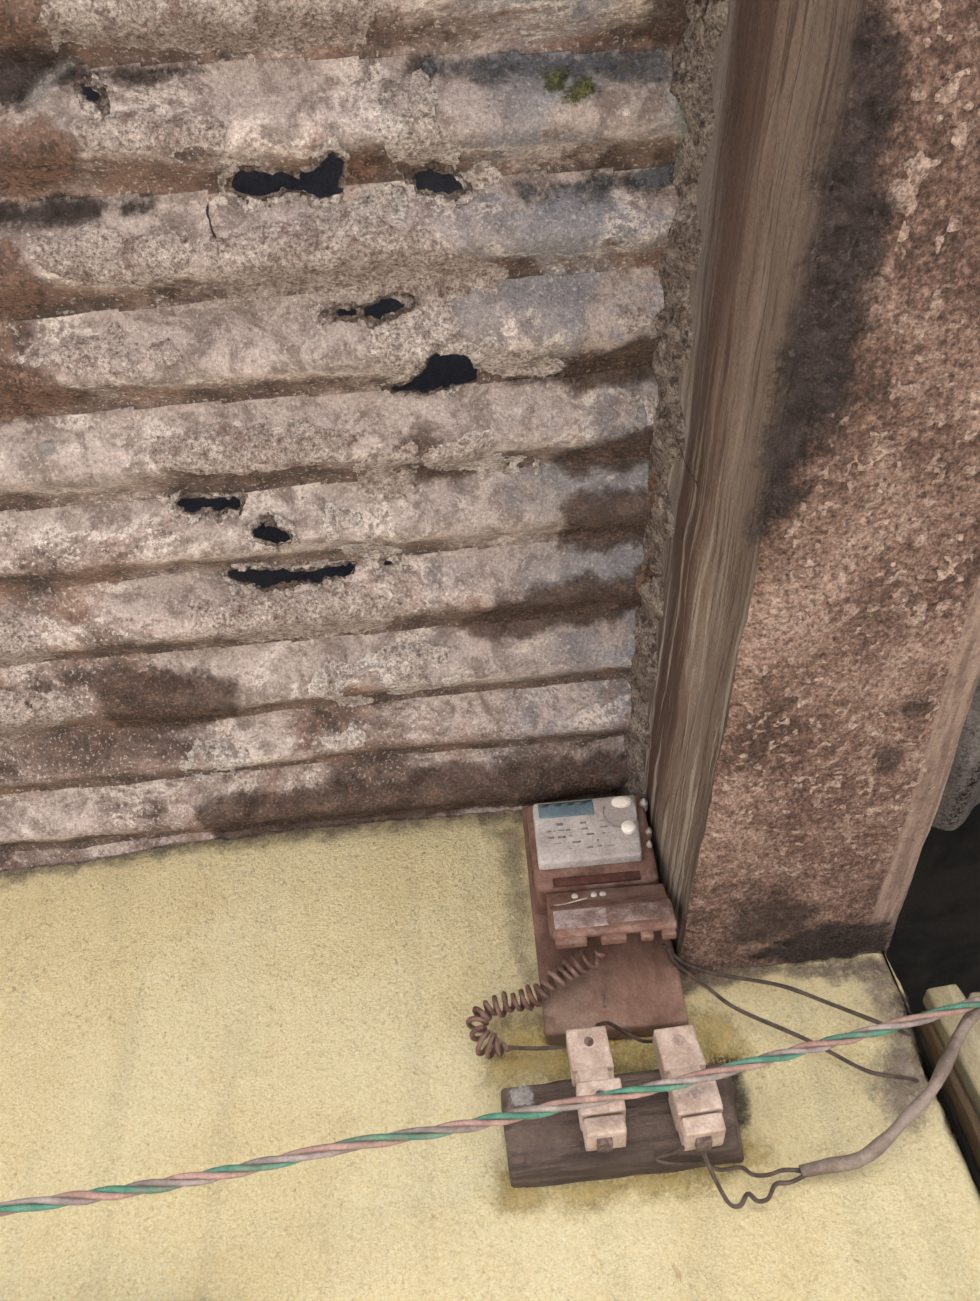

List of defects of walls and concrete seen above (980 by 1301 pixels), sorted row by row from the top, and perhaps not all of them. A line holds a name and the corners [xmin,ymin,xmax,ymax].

corrosion [343,149,385,191]
water stain [744,0,907,543]
water stain [488,1014,767,1213]
water stain [678,892,967,1161]